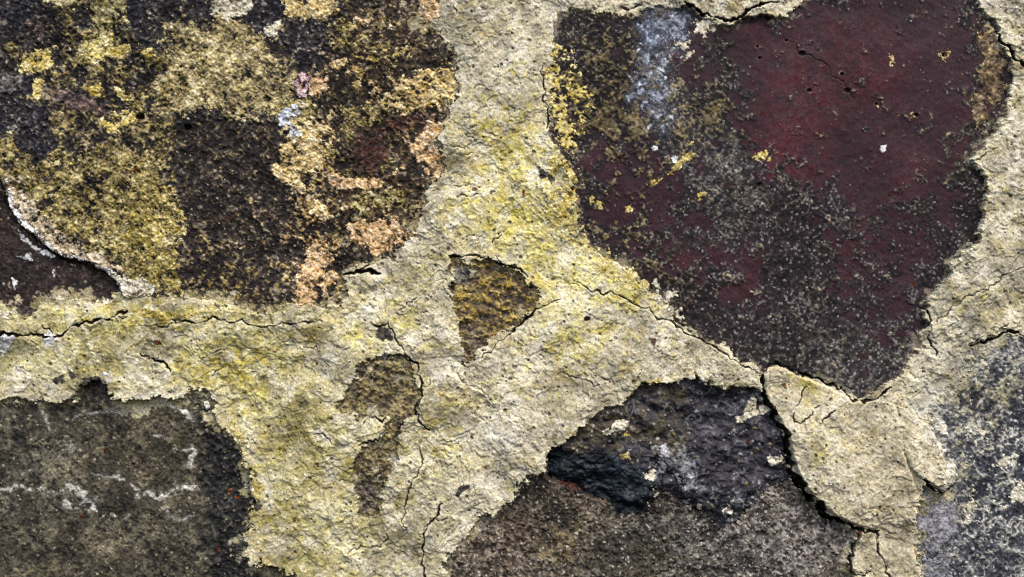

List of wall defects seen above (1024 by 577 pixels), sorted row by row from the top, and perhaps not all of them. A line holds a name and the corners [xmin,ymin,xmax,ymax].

peeling [381,61,459,180]
peeling [270,58,417,308]
peeling [7,176,128,276]
crack [0,310,323,352]
peeling [652,278,685,327]
spalling [53,368,112,403]
spalling [339,354,423,518]
peeling [602,419,630,436]
crack [481,282,892,577]
peeling [735,396,770,424]
spalling [546,447,658,516]
crack [923,479,955,494]